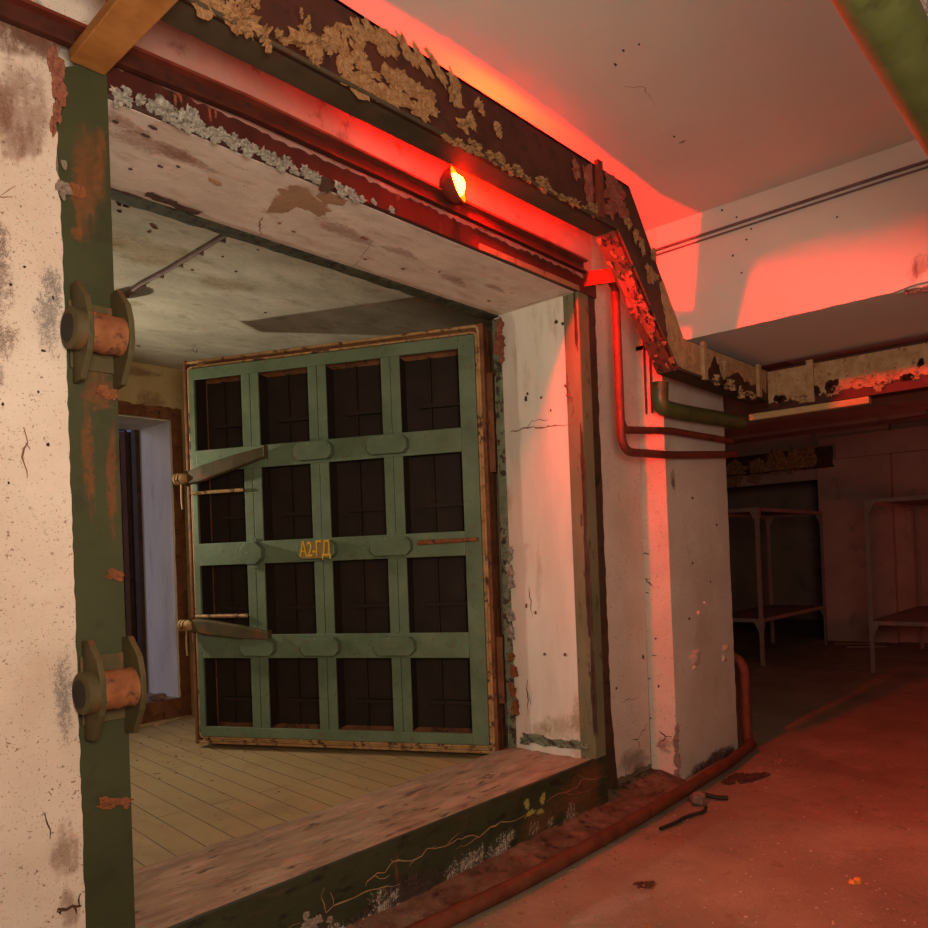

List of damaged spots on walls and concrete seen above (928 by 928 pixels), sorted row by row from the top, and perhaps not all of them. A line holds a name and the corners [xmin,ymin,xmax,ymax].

leakage [0,21,55,57]
spalling [109,85,377,224]
peeling [191,0,676,371]
leakage [34,270,62,353]
peeling [712,361,757,400]
peeling [855,370,920,392]
crack [511,418,578,432]
corrosion [104,568,125,581]
peeling [505,546,516,589]
peeling [580,422,598,736]